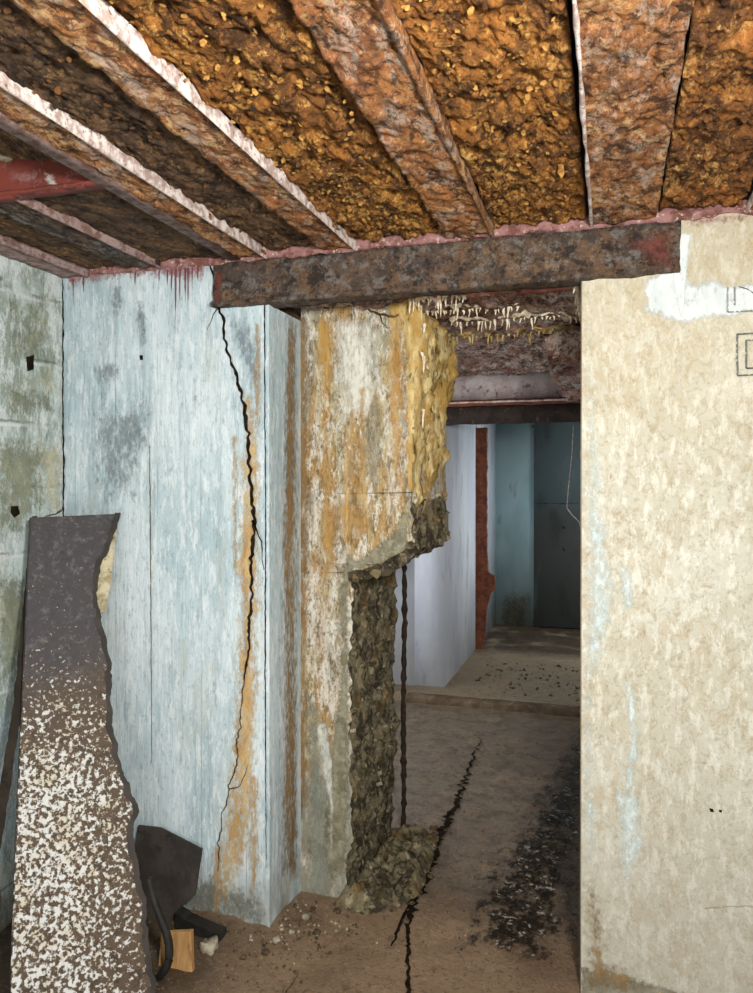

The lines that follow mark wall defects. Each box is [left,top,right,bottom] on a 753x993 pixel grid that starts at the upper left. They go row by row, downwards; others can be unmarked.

leakage [334,318,379,422]
rust [385,316,408,499]
leakage [389,286,581,518]
crack [207,305,267,871]
rust [214,325,260,913]
rust [282,319,366,874]
spalling [323,513,419,880]
crack [390,737,482,993]
leakage [579,894,675,993]